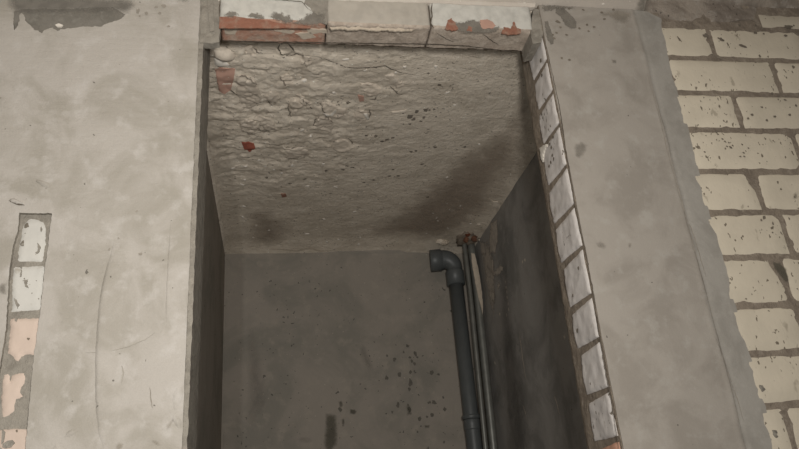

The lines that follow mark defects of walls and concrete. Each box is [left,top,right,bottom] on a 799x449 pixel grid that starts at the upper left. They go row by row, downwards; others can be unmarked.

spalling [219,0,415,39]
crack [248,6,512,74]
spalling [445,18,521,36]
leakage [400,156,499,232]
flaking render [0,198,52,449]